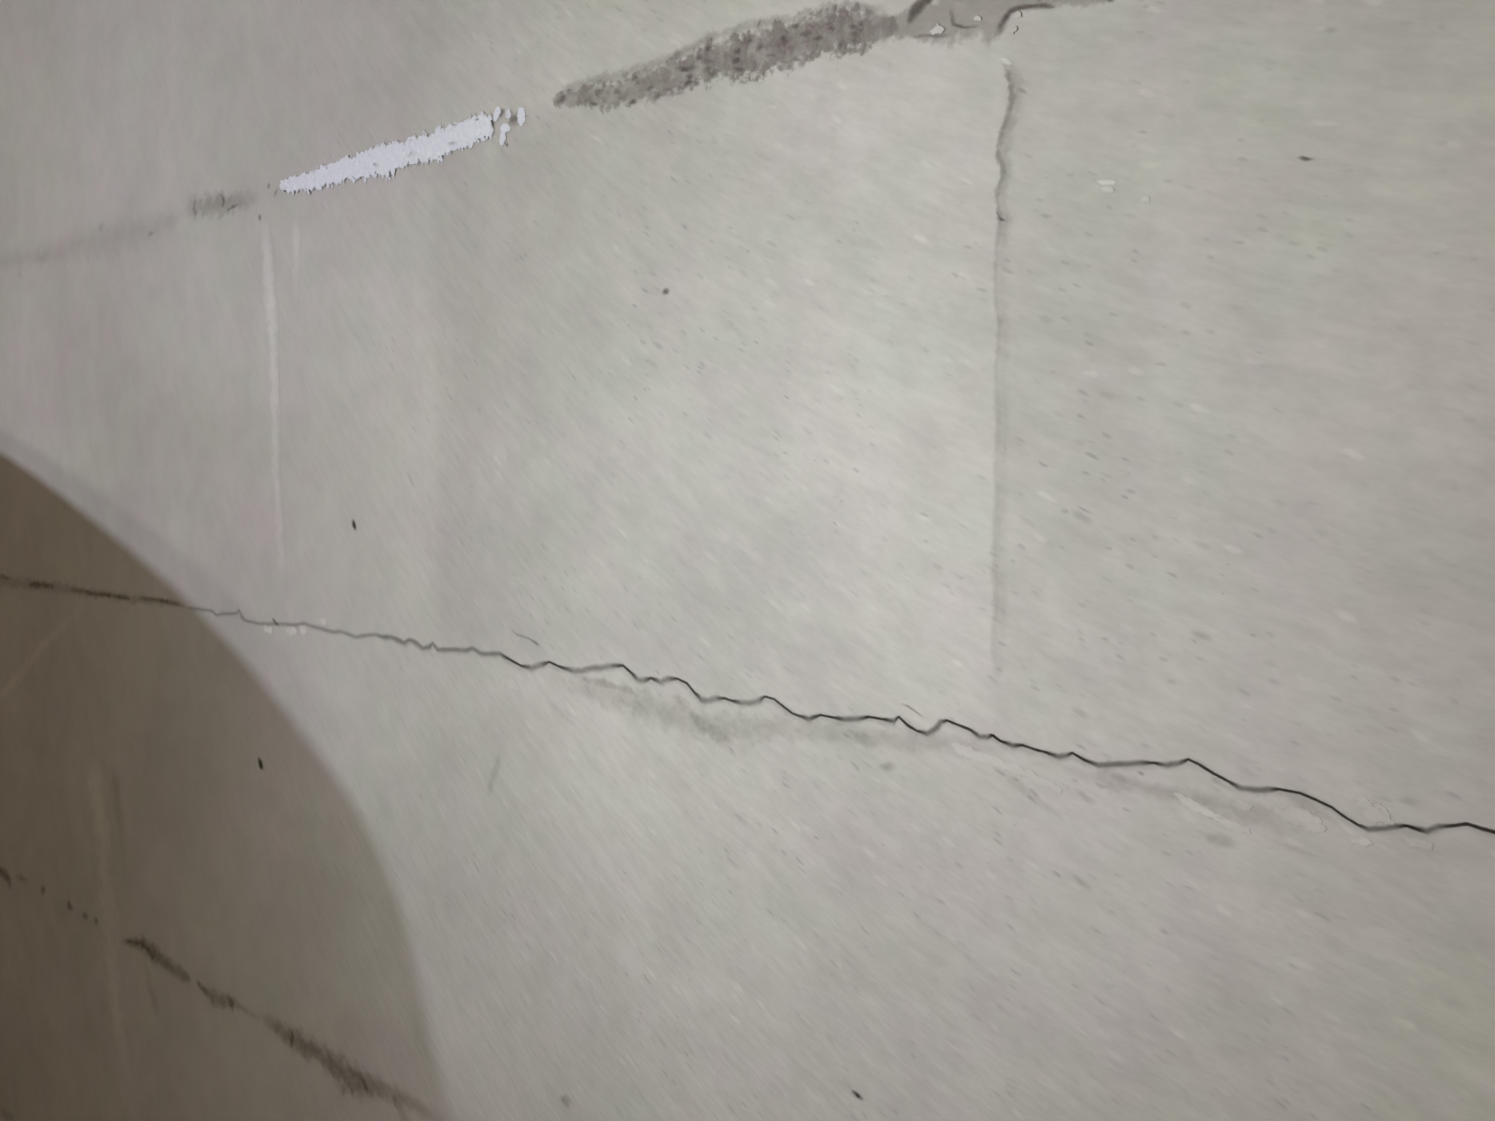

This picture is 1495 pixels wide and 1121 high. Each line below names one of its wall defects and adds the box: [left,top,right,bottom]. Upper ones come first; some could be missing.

spalling [559,4,892,109]
crack [504,656,567,669]
crack [616,664,1096,765]
crack [1143,758,1495,834]